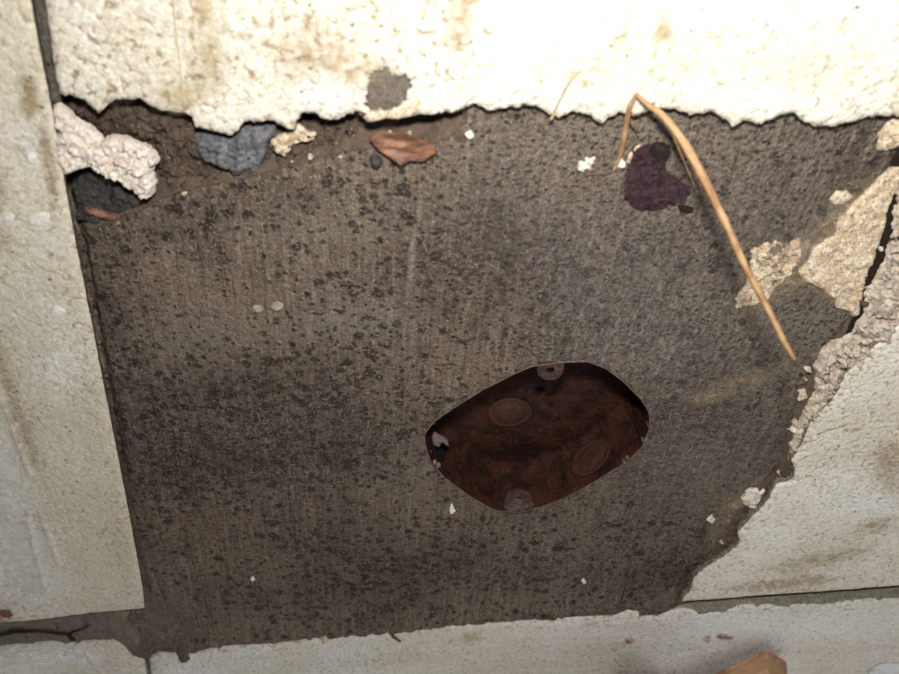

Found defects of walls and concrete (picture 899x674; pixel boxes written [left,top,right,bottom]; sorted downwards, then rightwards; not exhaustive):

spalling [52,66,475,229]
peeling [876,117,899,151]
crack [889,147,899,167]
crack [846,194,899,334]
spalling [674,166,899,605]
crack [0,624,92,641]
spalling [176,643,190,663]